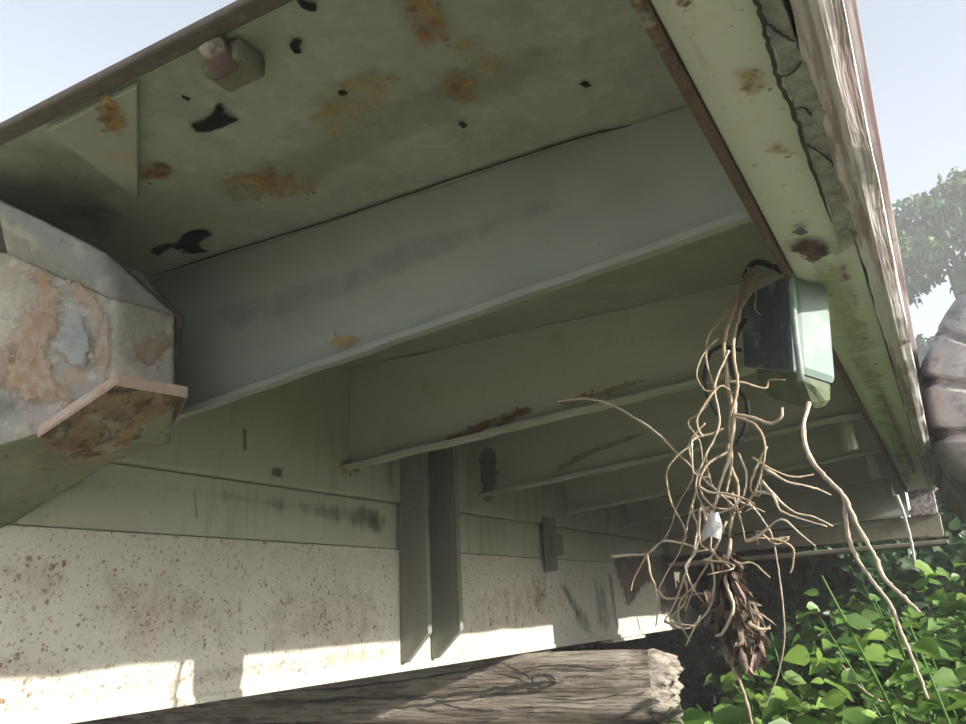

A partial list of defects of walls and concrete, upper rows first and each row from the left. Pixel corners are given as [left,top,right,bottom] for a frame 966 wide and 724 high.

peeling [191,104,239,132]
crack [752,0,834,224]
peeling [151,230,211,255]
corrosion [791,241,838,262]
peeling [0,270,109,409]
corrosion [447,407,530,440]
crack [270,662,619,724]